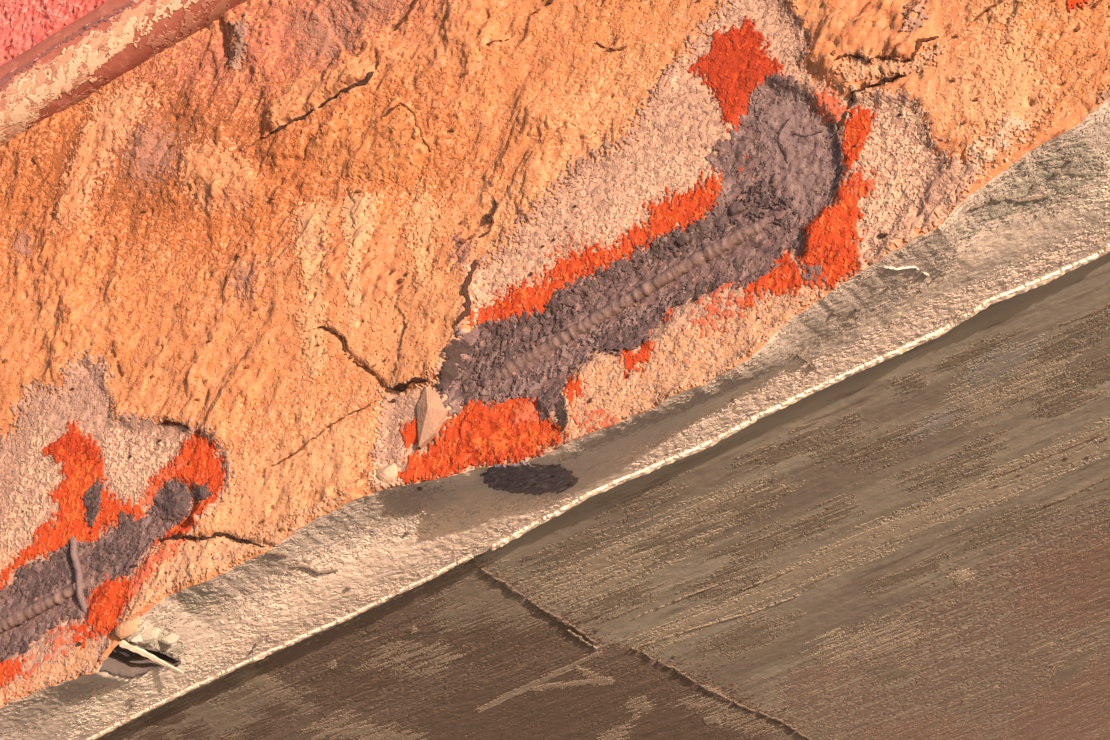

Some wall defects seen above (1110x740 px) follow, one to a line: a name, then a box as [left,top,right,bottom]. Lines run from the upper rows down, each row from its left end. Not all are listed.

crack [394,0,418,30]
crack [836,2,939,64]
crack [974,0,1005,21]
crack [248,40,379,159]
crack [383,99,432,152]
spalling [366,0,1110,493]
crack [264,326,427,477]
spalling [0,348,350,708]
crack [153,532,266,547]
crack [289,564,339,575]